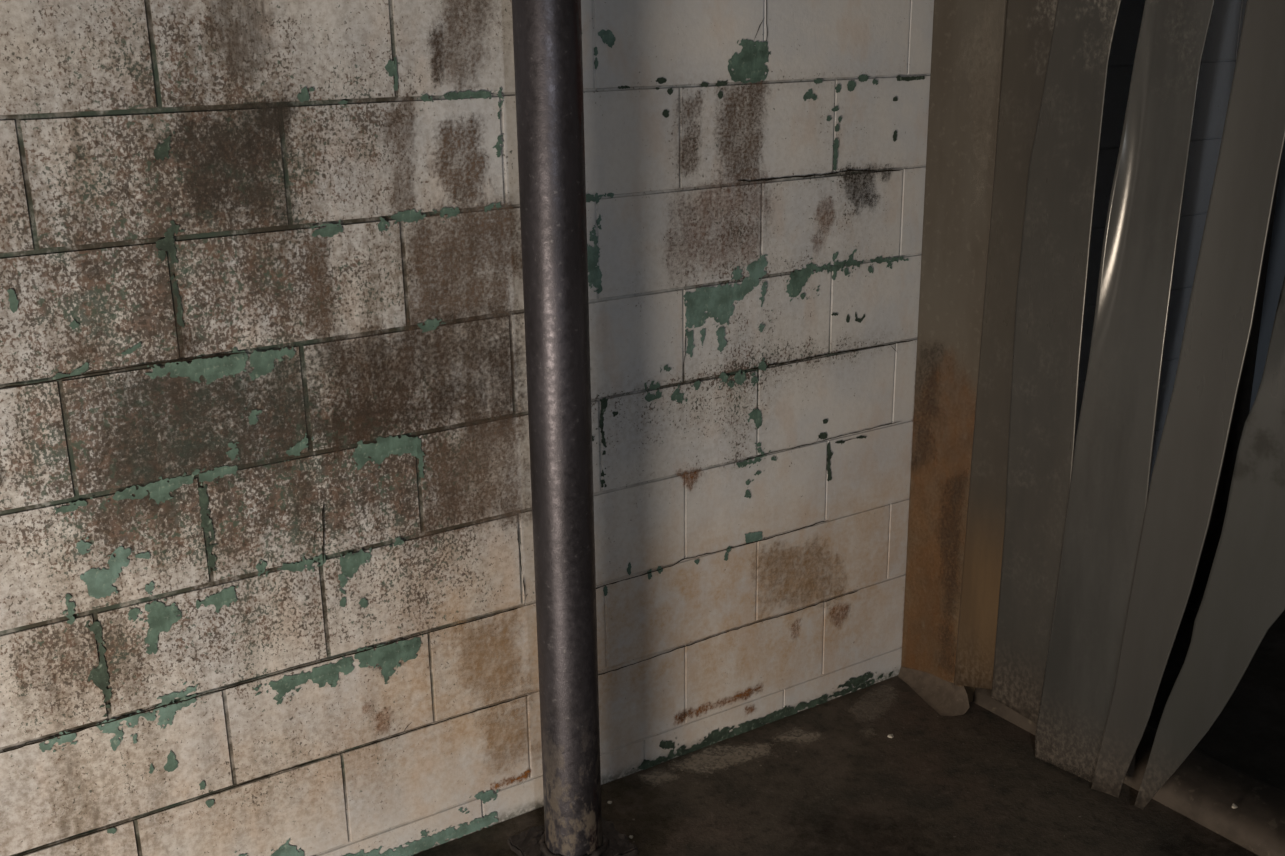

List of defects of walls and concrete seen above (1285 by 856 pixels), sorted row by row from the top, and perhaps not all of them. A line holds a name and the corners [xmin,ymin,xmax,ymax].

leakage [430,0,491,87]
peeling [701,34,771,99]
leakage [667,81,768,275]
leakage [844,167,890,207]
leakage [108,98,532,543]
peeling [681,255,768,358]
peeling [786,249,909,301]
peeling [60,537,201,751]
peeling [253,635,423,705]
rust [675,685,762,725]
peeling [633,667,896,770]
peeling [344,790,498,856]